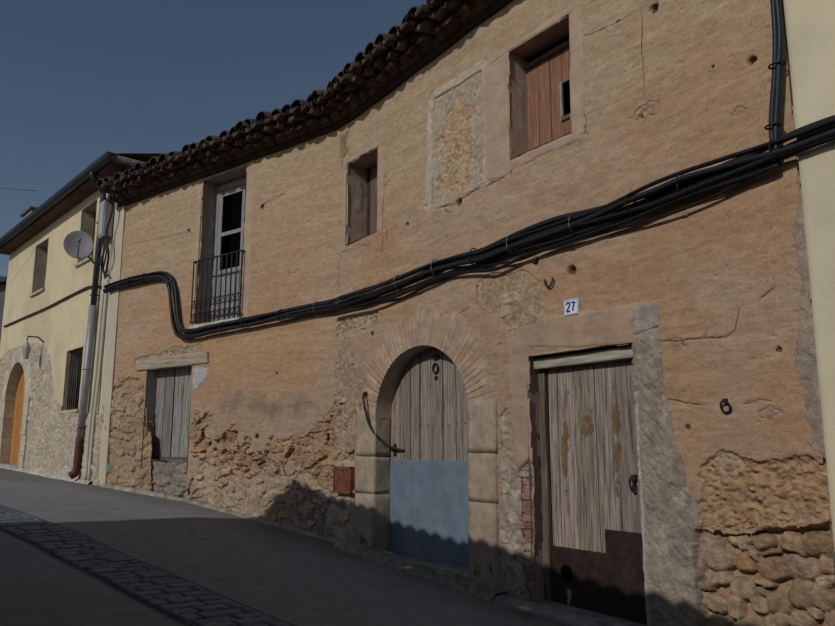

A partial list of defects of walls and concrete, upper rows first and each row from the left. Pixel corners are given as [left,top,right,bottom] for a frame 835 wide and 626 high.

crack [587,7,658,115]
crack [664,310,739,346]
flaking render [515,461,535,612]
spalling [699,451,832,535]